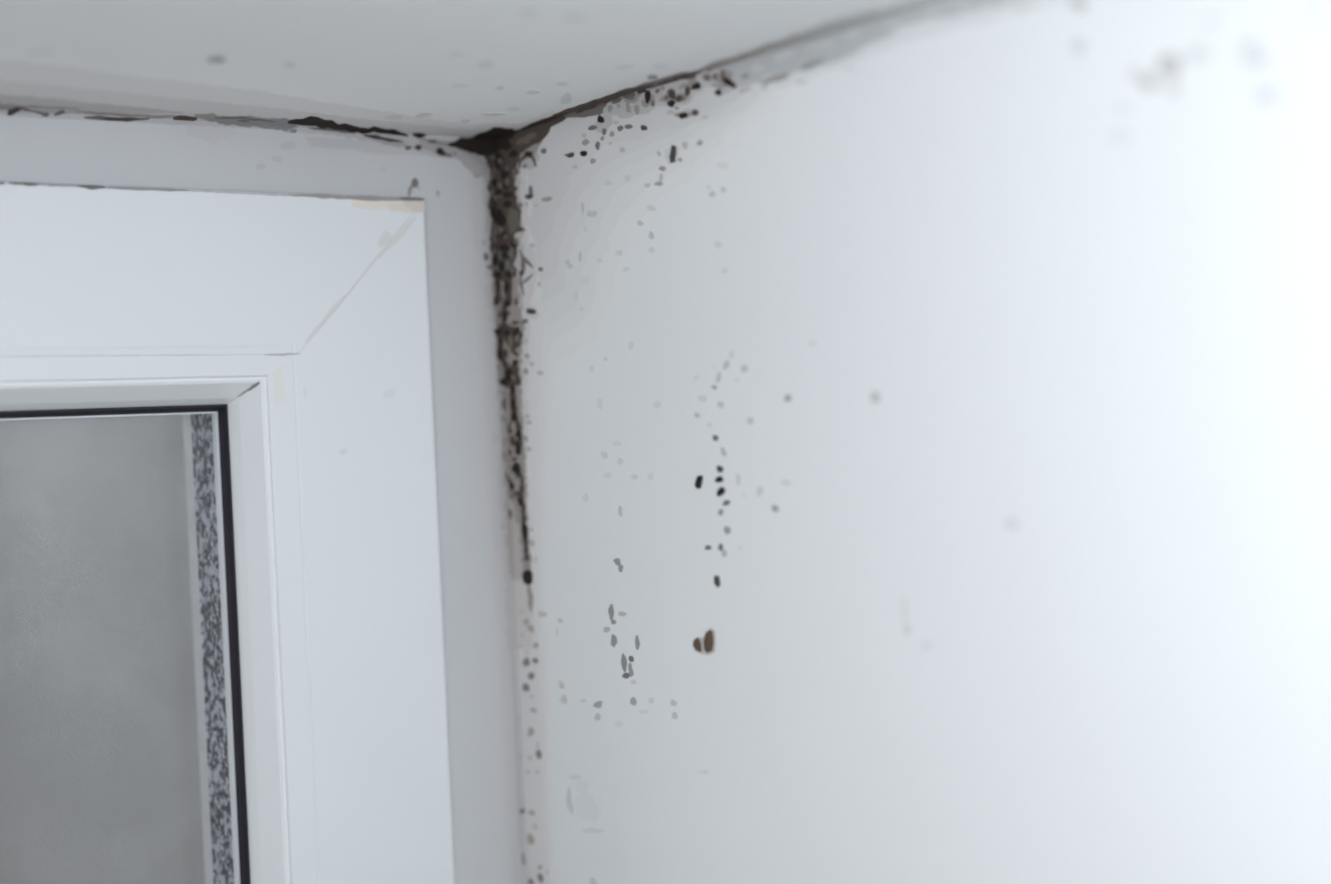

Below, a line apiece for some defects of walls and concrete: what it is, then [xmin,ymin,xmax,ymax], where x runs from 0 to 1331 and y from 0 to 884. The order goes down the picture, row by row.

damp [494,133,515,153]
damp [515,132,538,146]
damp [491,152,504,171]
damp [497,208,507,233]
damp [500,244,510,258]
damp [500,280,509,305]
mould [693,350,779,557]
mould [603,604,655,714]